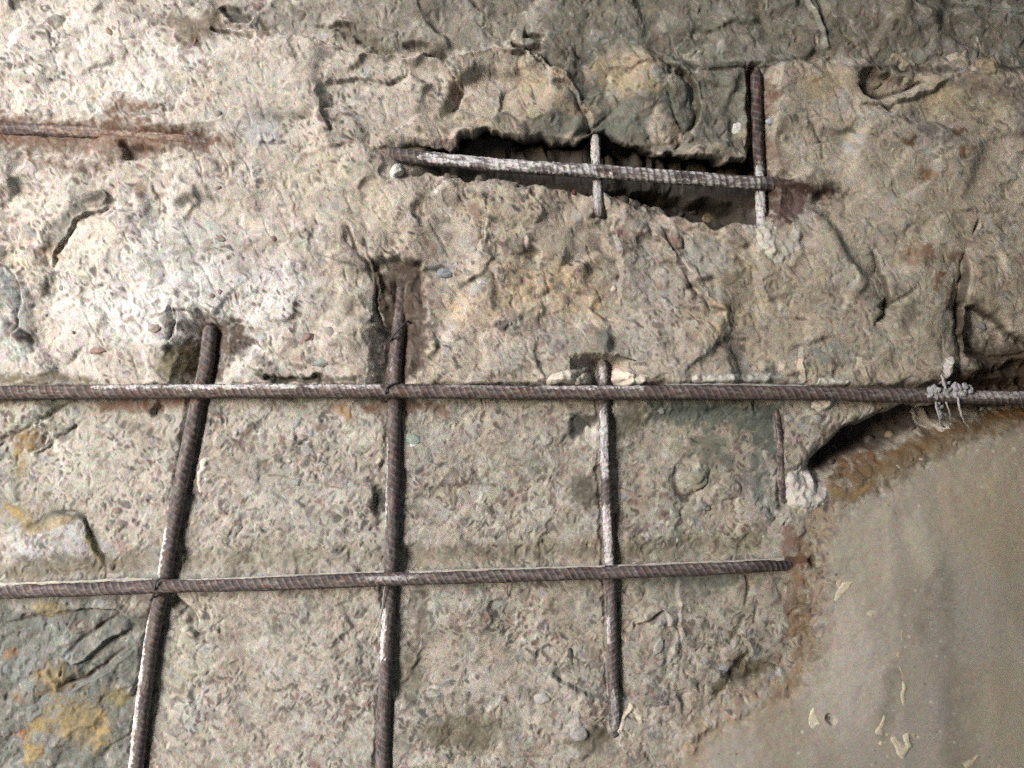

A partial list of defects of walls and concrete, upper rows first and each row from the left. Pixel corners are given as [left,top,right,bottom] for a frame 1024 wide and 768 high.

corrosion [0,99,230,171]
spalling [0,0,1024,389]
corrosion [168,315,252,381]
corrosion [925,301,1024,391]
corrosion [827,407,1024,498]
spalling [0,383,1024,768]
corrosion [782,526,815,689]